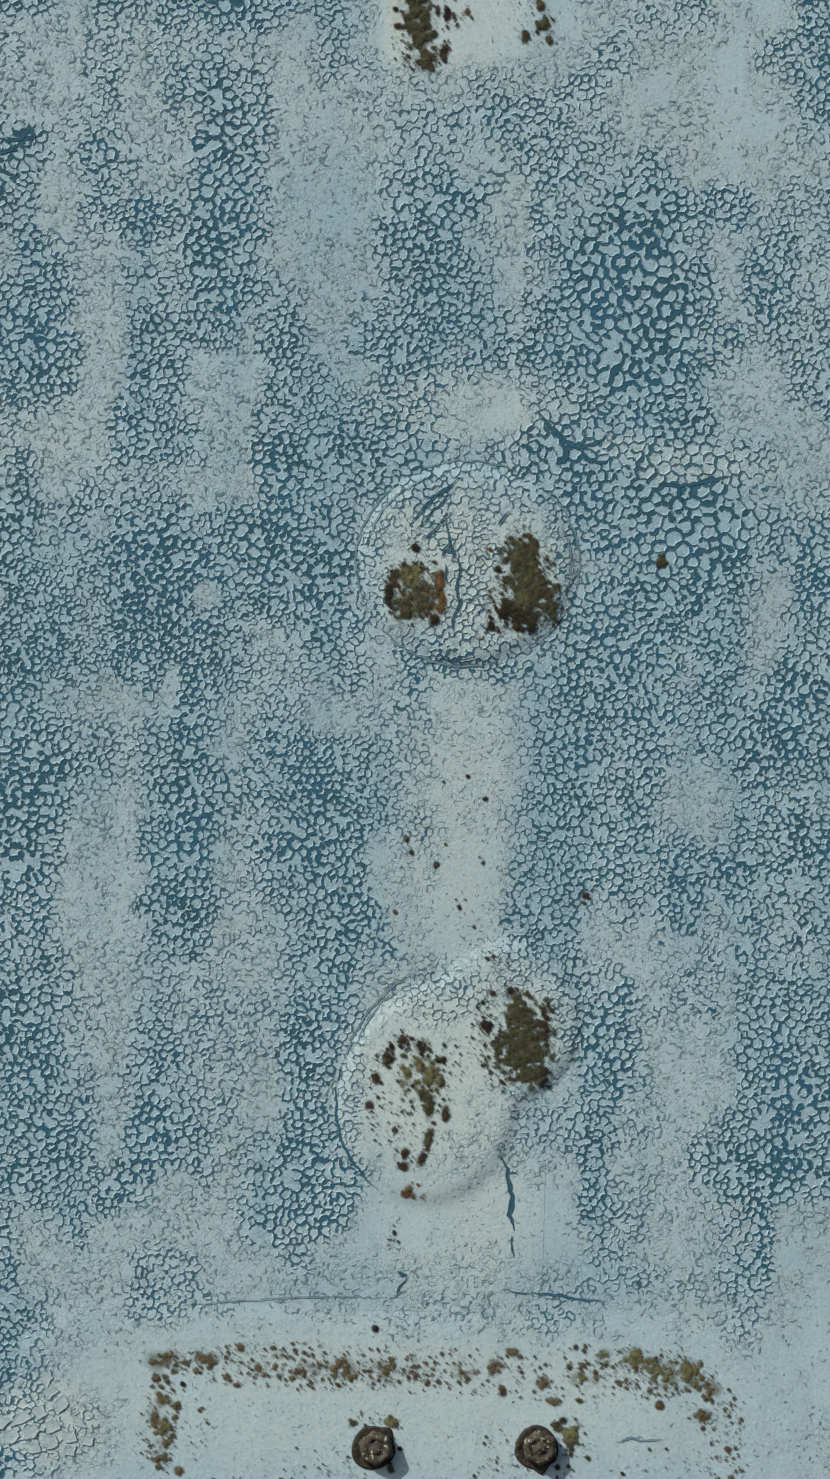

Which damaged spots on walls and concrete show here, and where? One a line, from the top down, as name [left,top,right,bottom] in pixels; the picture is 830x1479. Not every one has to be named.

rust [391,0,473,72]
rust [513,0,555,44]
rust [384,543,446,627]
rust [476,525,563,639]
rust [365,951,557,1198]
rust [135,1325,748,1479]
crack [610,1371,696,1471]
crack [686,1403,830,1476]